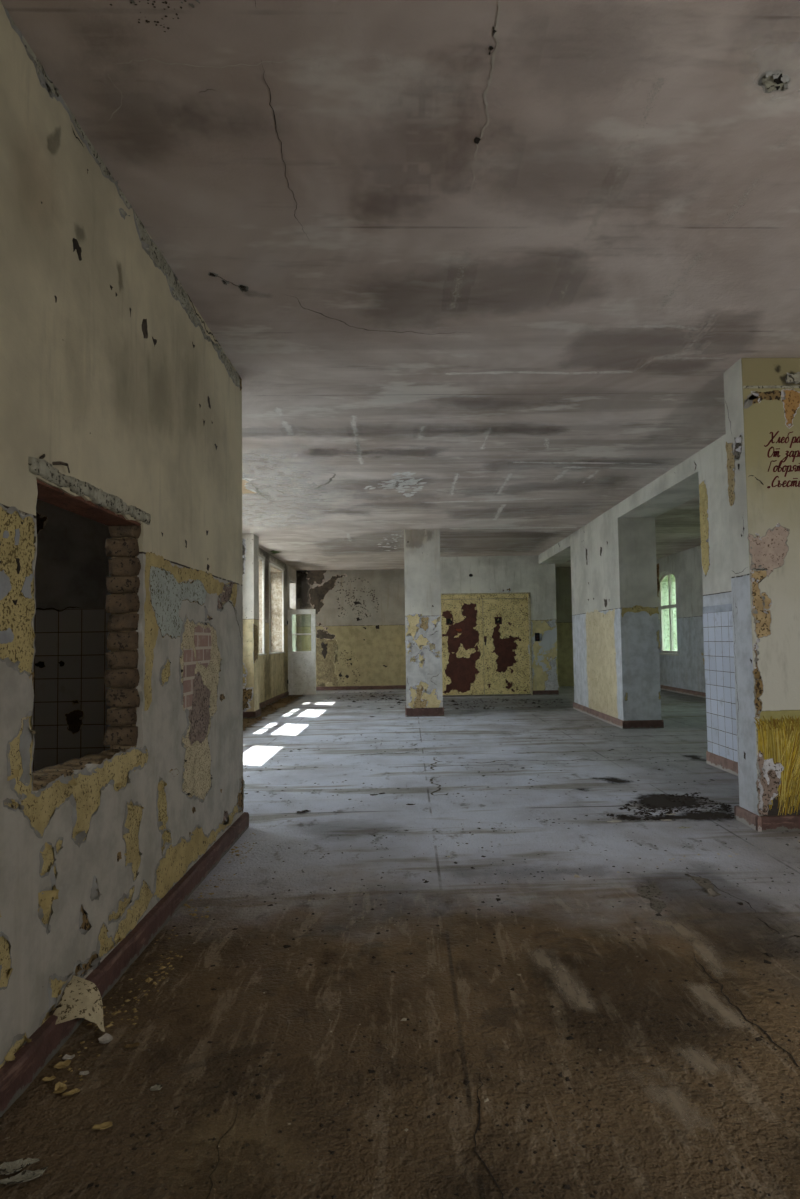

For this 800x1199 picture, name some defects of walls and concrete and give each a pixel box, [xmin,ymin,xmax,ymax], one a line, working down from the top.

spalling [757,69,792,93]
crack [261,62,309,239]
crack [208,272,249,292]
spalling [28,456,163,536]
peeling [699,480,710,577]
peeling [725,433,743,507]
peeling [0,503,48,679]
flaking render [306,570,379,686]
peeling [405,602,560,709]
peeling [586,563,660,718]
peeling [741,523,790,718]
peeling [0,538,247,1068]